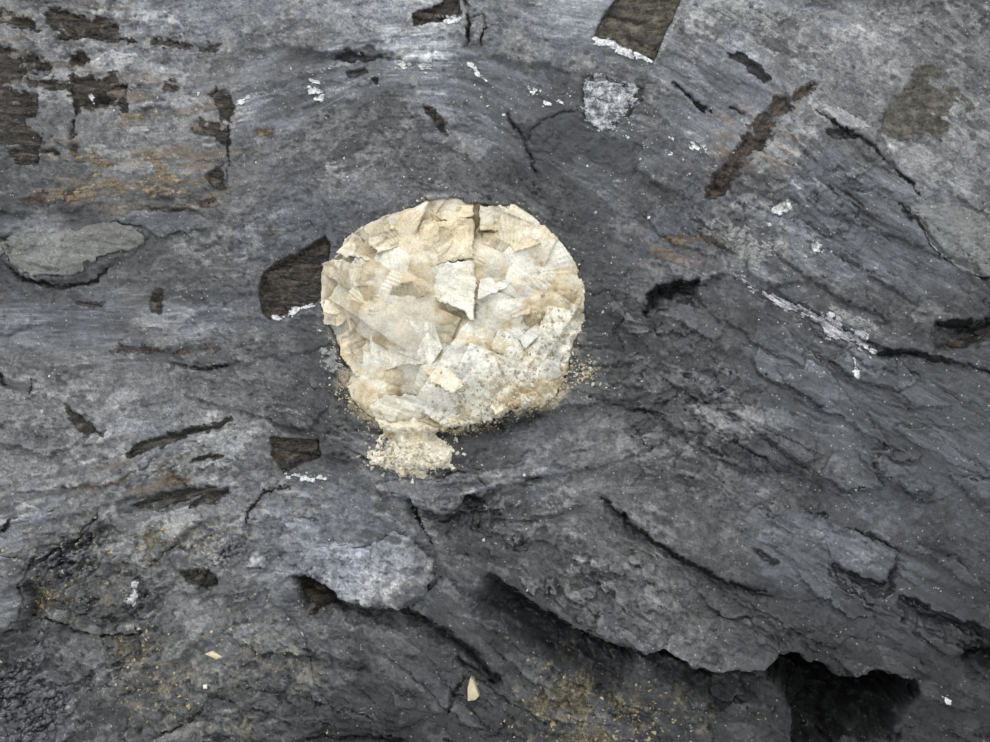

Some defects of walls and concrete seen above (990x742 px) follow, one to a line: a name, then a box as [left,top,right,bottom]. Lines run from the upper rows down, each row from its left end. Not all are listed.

spalling [147,34,223,53]
spalling [412,0,462,26]
spalling [595,0,680,59]
spalling [0,6,136,168]
corrosion [701,80,818,203]
spalling [259,237,330,318]
crack [644,279,700,318]
spalling [270,437,320,473]